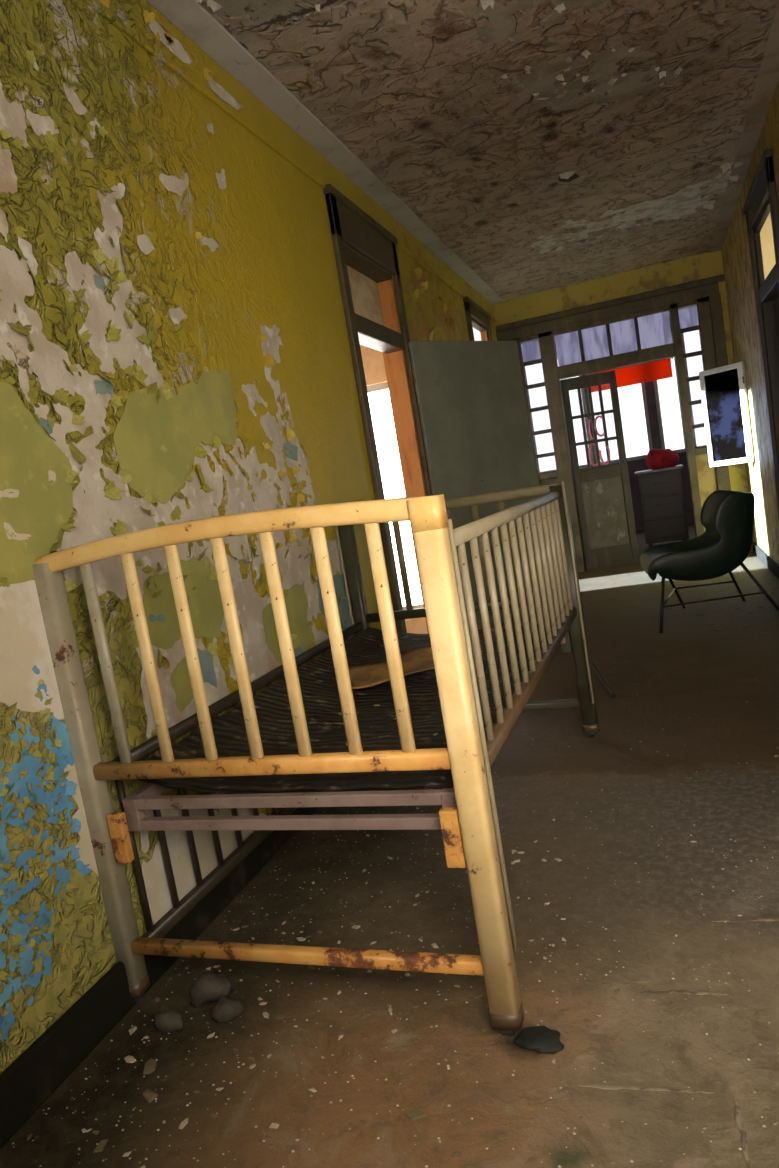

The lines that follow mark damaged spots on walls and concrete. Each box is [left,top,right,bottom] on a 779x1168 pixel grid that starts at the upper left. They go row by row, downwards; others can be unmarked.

peeling [195,0,223,12]
crack [239,0,337,32]
peeling [26,50,41,71]
peeling [143,10,244,110]
peeling [0,74,354,1041]